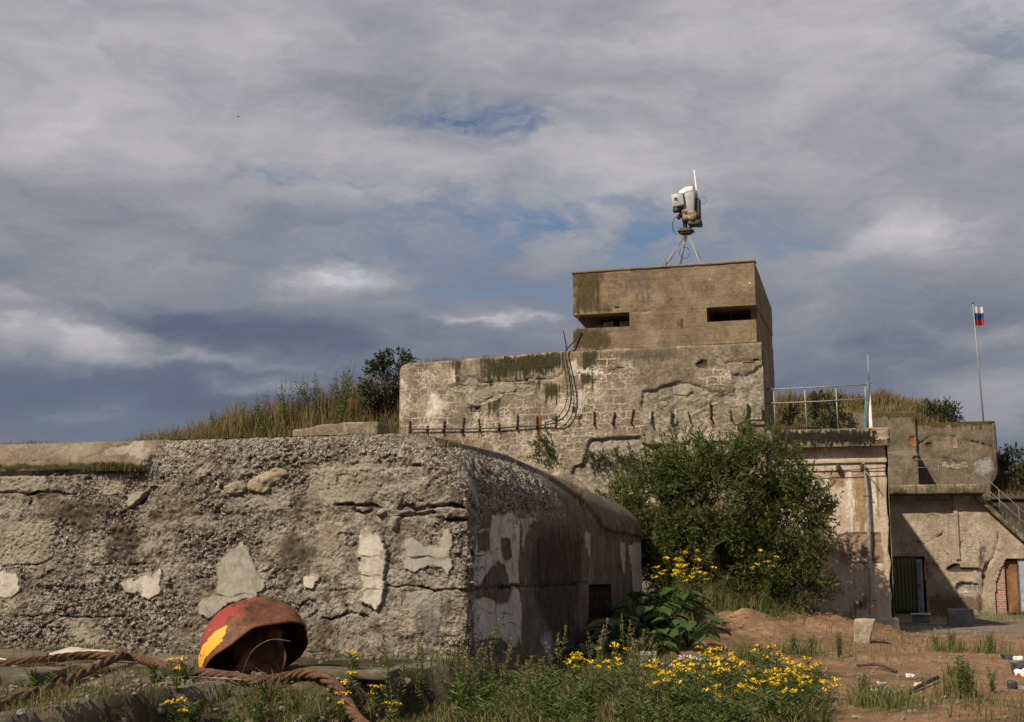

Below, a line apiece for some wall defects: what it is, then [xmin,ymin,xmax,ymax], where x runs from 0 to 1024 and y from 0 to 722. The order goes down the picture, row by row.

leakage [399,352,650,477]
crack [6,491,74,505]
flaking render [0,518,56,598]
flaking render [121,568,163,600]
flaking render [198,541,266,619]
flaking render [357,527,389,612]
flaking render [403,509,538,651]